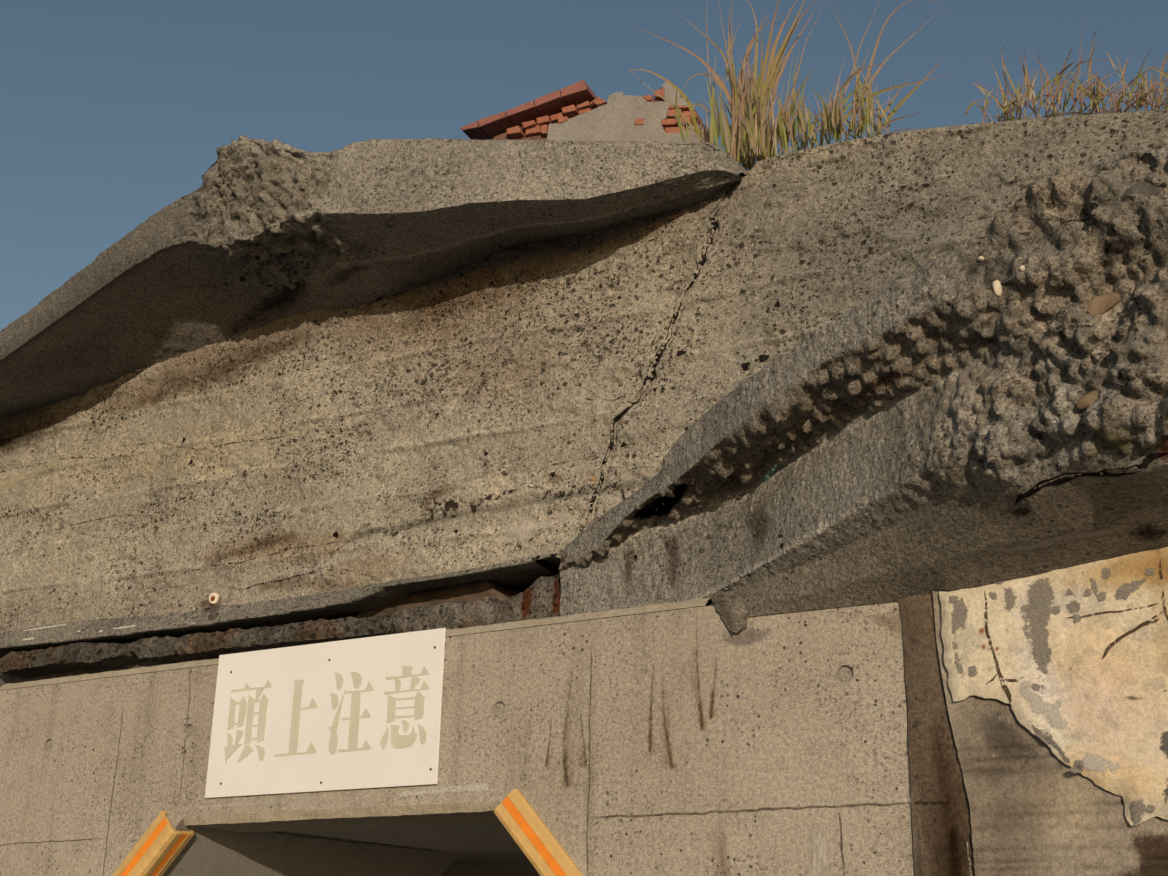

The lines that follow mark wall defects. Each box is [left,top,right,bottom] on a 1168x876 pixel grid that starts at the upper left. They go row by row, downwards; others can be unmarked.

spalling [203,153,336,292]
crack [383,176,739,537]
crack [1014,452,1168,505]
crack [195,538,373,591]
peeling [949,596,977,678]
peeling [989,567,1155,774]
peeling [1160,731,1168,756]
peeling [1129,780,1168,824]
water stain [1126,836,1168,876]